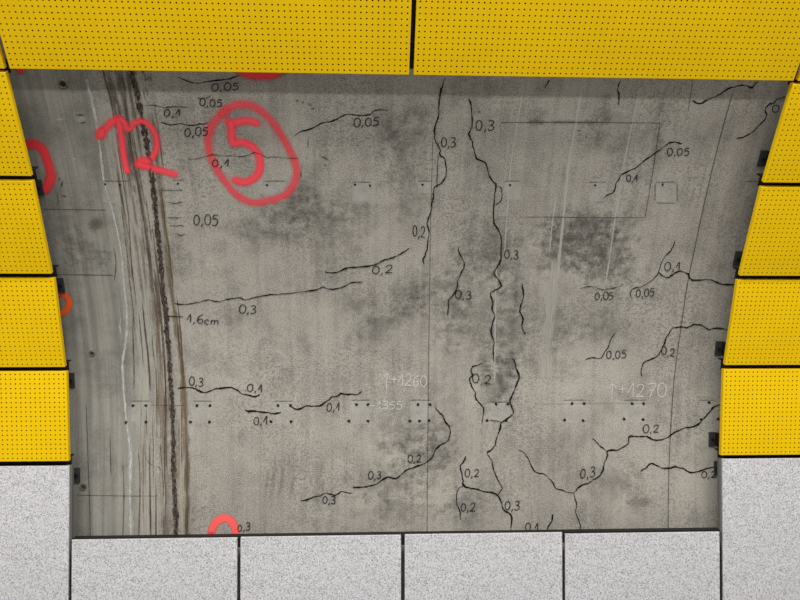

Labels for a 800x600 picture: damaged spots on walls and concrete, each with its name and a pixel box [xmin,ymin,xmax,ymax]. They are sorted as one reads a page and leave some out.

crack [692,81,759,104]
crack [736,96,785,139]
crack [604,142,682,198]
crack [129,71,451,535]
crack [447,248,465,315]
crack [456,99,520,527]
crack [518,285,526,334]
crack [580,241,735,298]
crack [641,323,728,376]
crack [519,404,720,529]